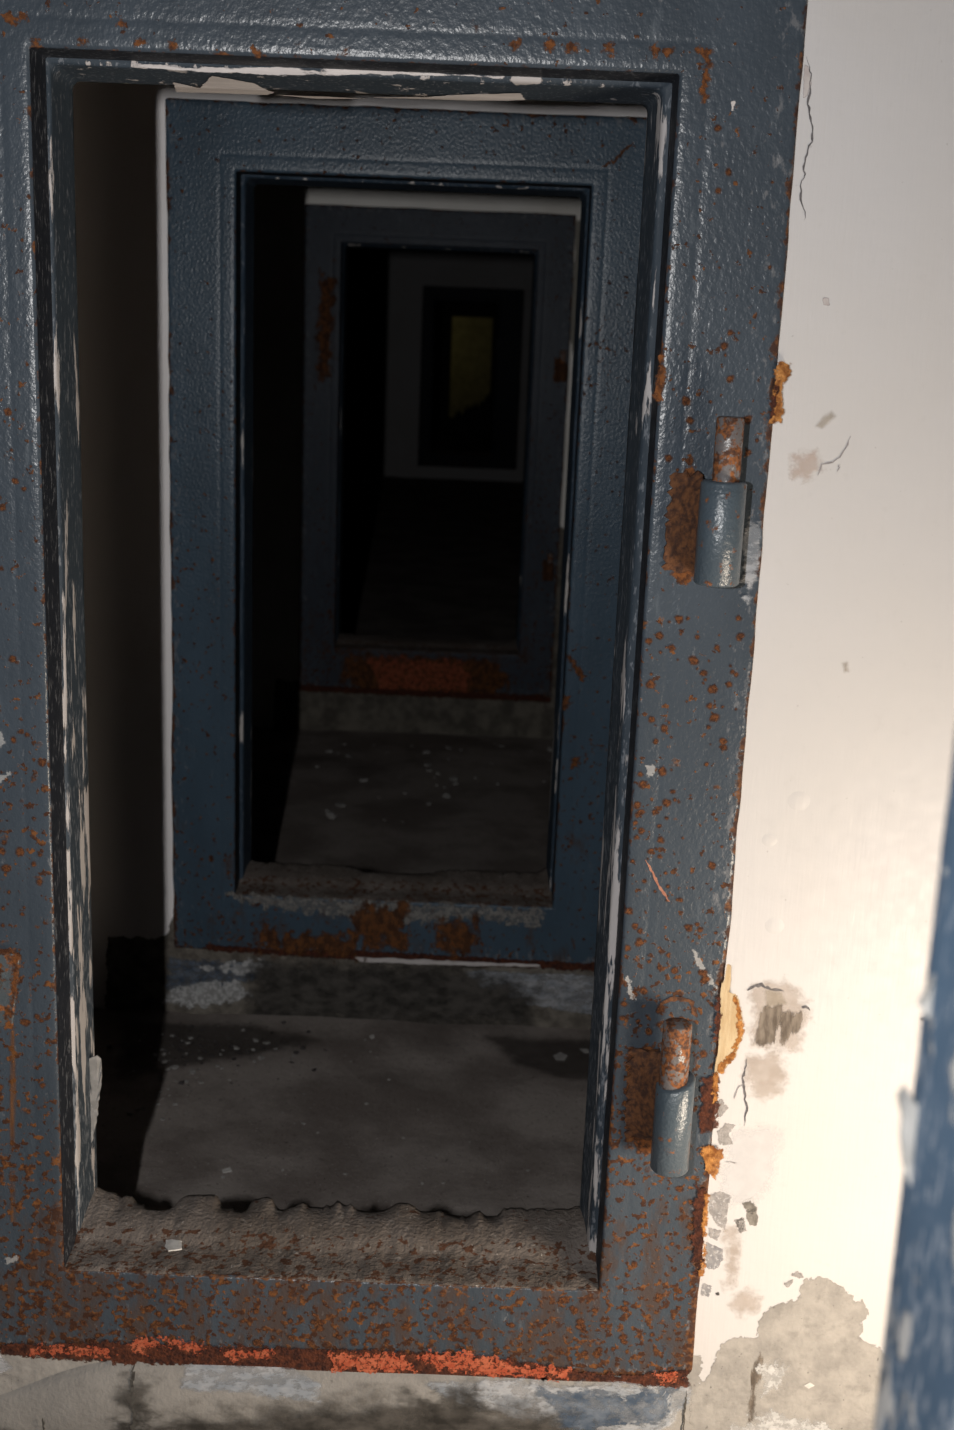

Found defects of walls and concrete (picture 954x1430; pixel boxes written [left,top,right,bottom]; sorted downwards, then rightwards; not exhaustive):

rust [652,354,694,424]
rust [768,361,792,424]
rust [645,615,744,751]
rust [206,944,595,972]
rust [616,970,710,1160]
peeling [713,964,745,1074]
peeling [918,974,936,1020]
rust [660,1072,724,1276]
peeling [896,1084,918,1186]
spalling [701,1192,758,1297]
rust [0,1222,691,1389]
peeling [689,1271,882,1430]